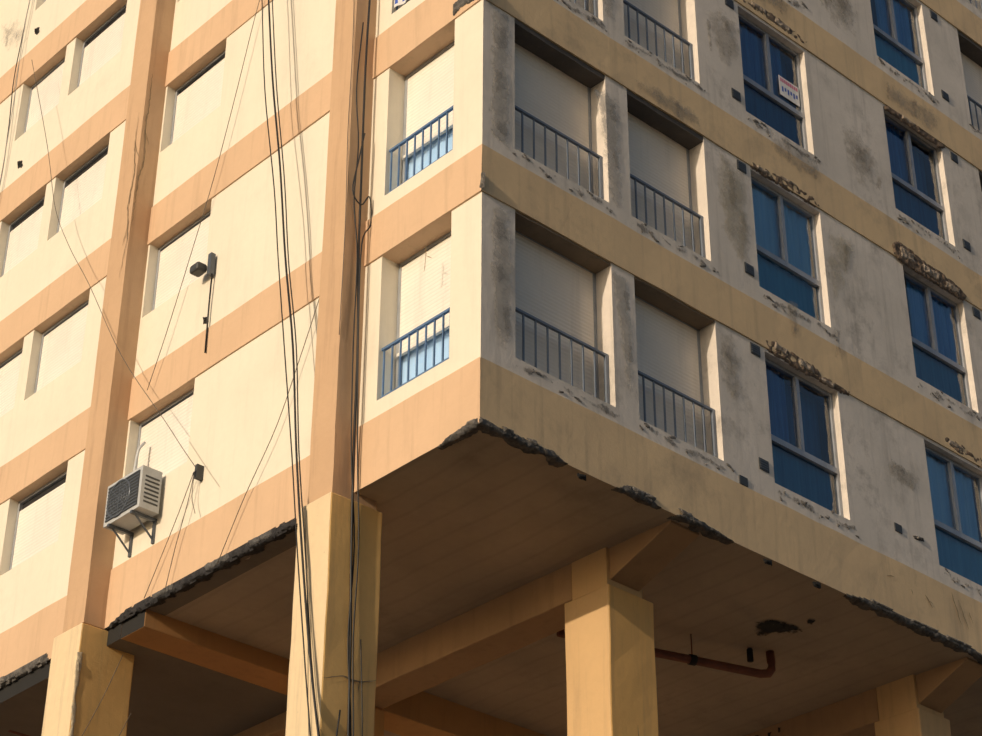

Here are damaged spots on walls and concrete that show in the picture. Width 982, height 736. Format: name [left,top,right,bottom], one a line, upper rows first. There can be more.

spalling [453,0,474,16]
peeling [492,11,509,141]
spalling [750,162,819,209]
spalling [892,241,967,301]
spalling [766,340,850,396]
spalling [437,417,568,468]
spalling [611,485,734,545]
spalling [843,593,982,664]